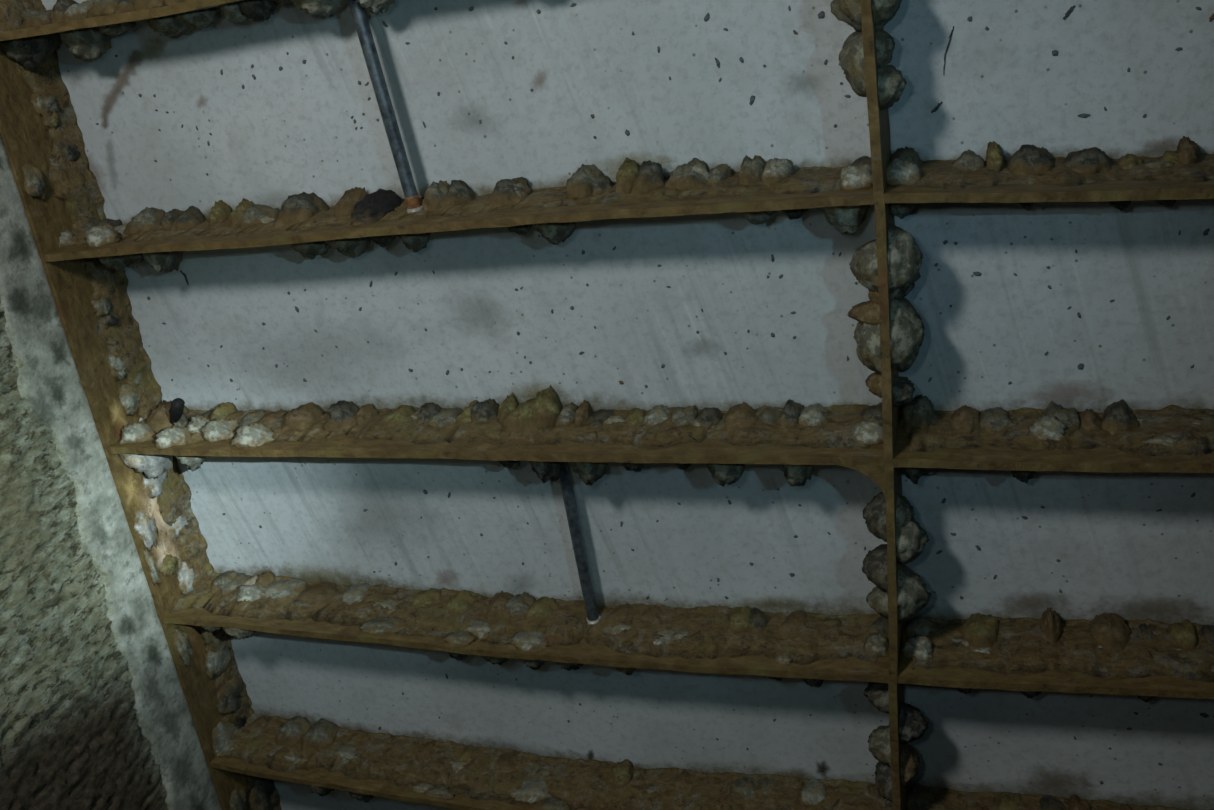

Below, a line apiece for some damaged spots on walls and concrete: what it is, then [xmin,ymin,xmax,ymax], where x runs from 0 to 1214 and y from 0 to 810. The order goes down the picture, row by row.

water stain [103,51,140,127]